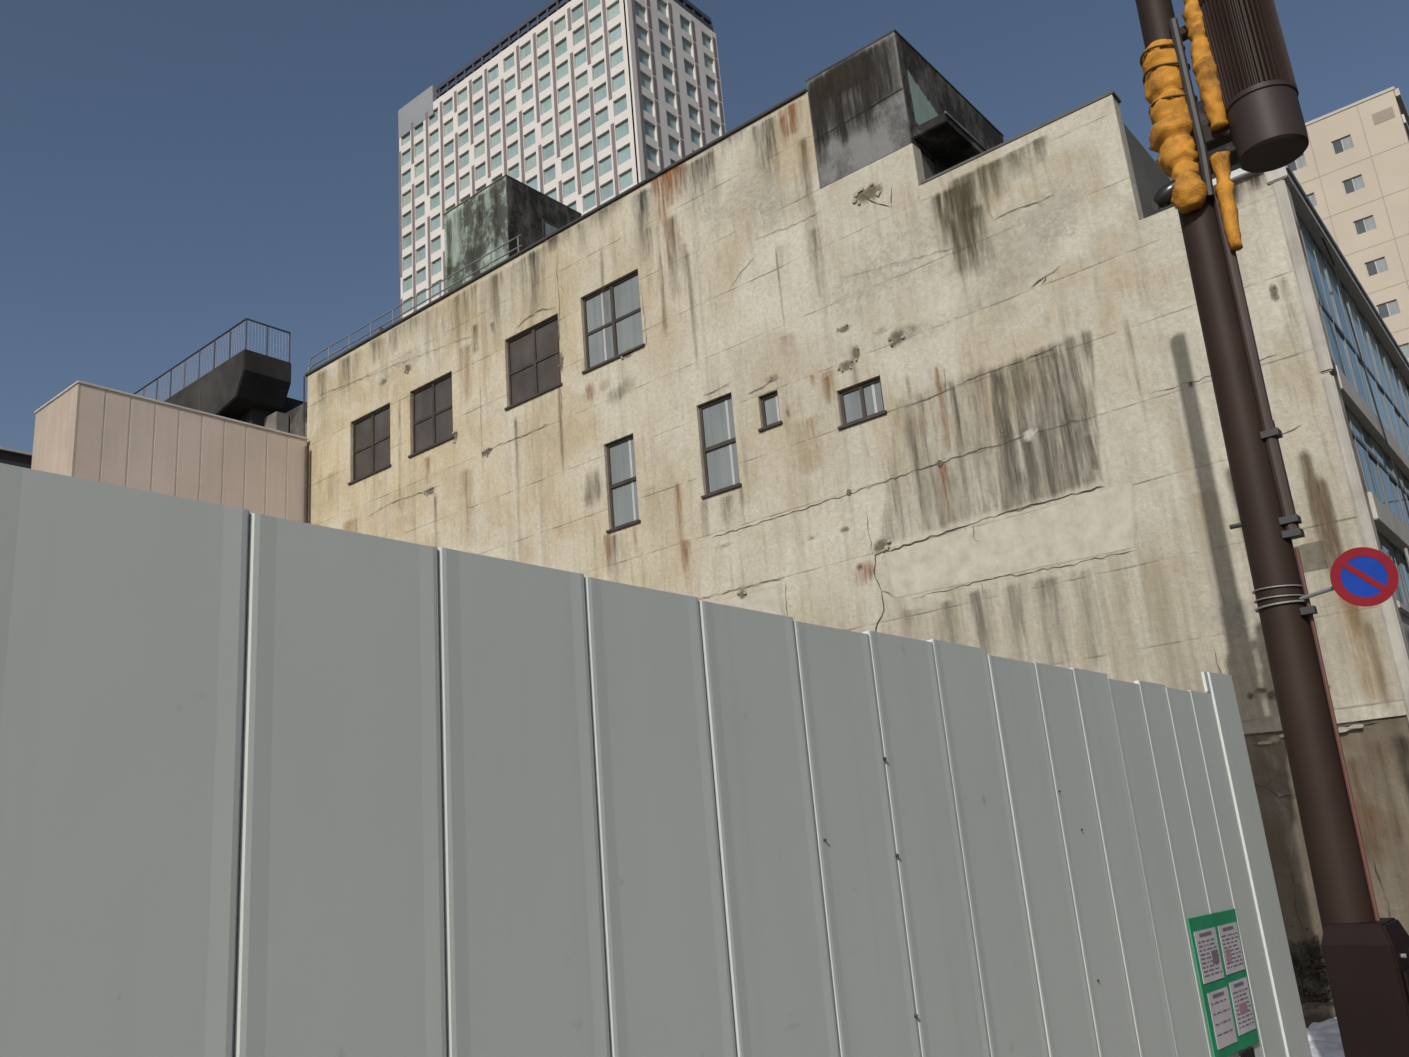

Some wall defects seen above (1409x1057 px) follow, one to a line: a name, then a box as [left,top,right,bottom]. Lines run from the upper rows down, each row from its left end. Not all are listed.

water stain [936,152,1017,265]
water stain [991,334,1091,508]
crack [712,420,1134,632]
water stain [1301,453,1341,564]